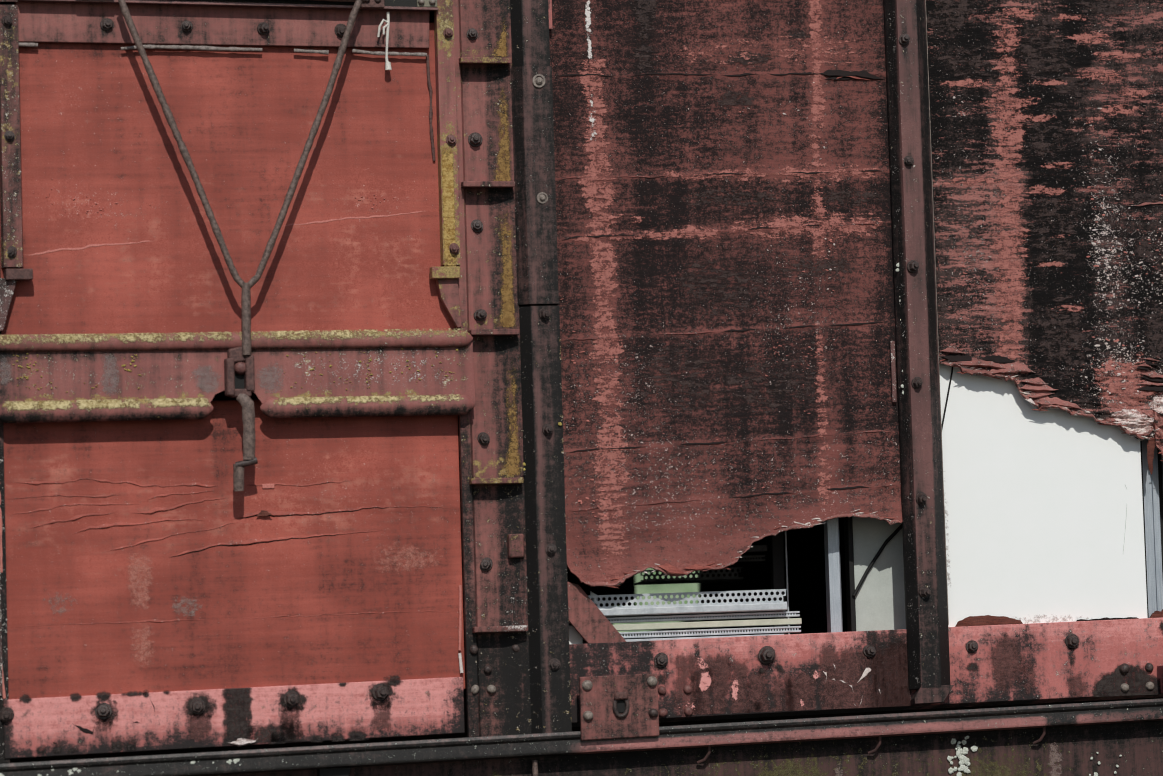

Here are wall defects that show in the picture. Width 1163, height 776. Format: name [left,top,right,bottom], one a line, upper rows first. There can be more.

peeling [1086,186,1163,305]
peeling [939,346,1085,411]
peeling [1076,318,1163,440]
crack [12,478,443,557]
peeling [657,563,714,575]
rust [91,699,118,731]
rust [183,693,217,740]
rust [279,687,307,738]
rust [369,682,393,731]